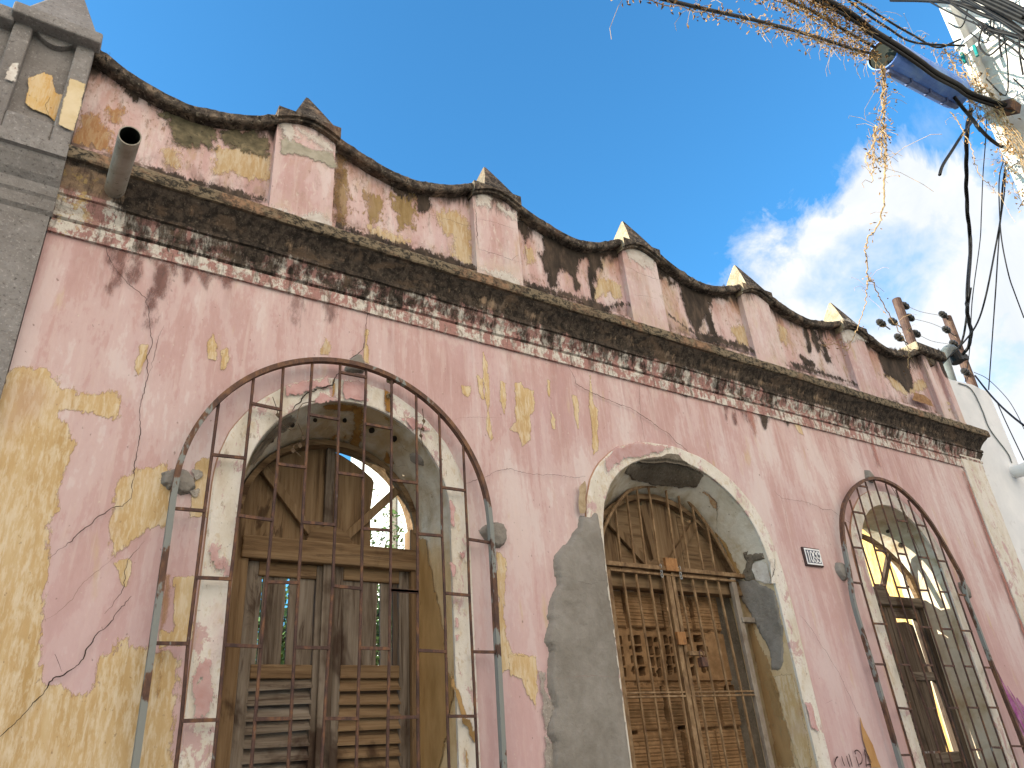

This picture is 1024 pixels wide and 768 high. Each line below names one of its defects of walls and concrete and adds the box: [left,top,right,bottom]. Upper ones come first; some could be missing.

peeling [5,63,128,154]
crack [47,203,162,560]
rust [323,380,364,447]
peeling [461,352,535,446]
leakage [524,234,631,312]
leakage [658,268,755,354]
leakage [790,328,858,387]
leakage [878,347,916,393]
peeling [0,366,217,768]
rust [963,471,1024,634]
crack [1,538,140,736]
peeling [496,552,538,706]